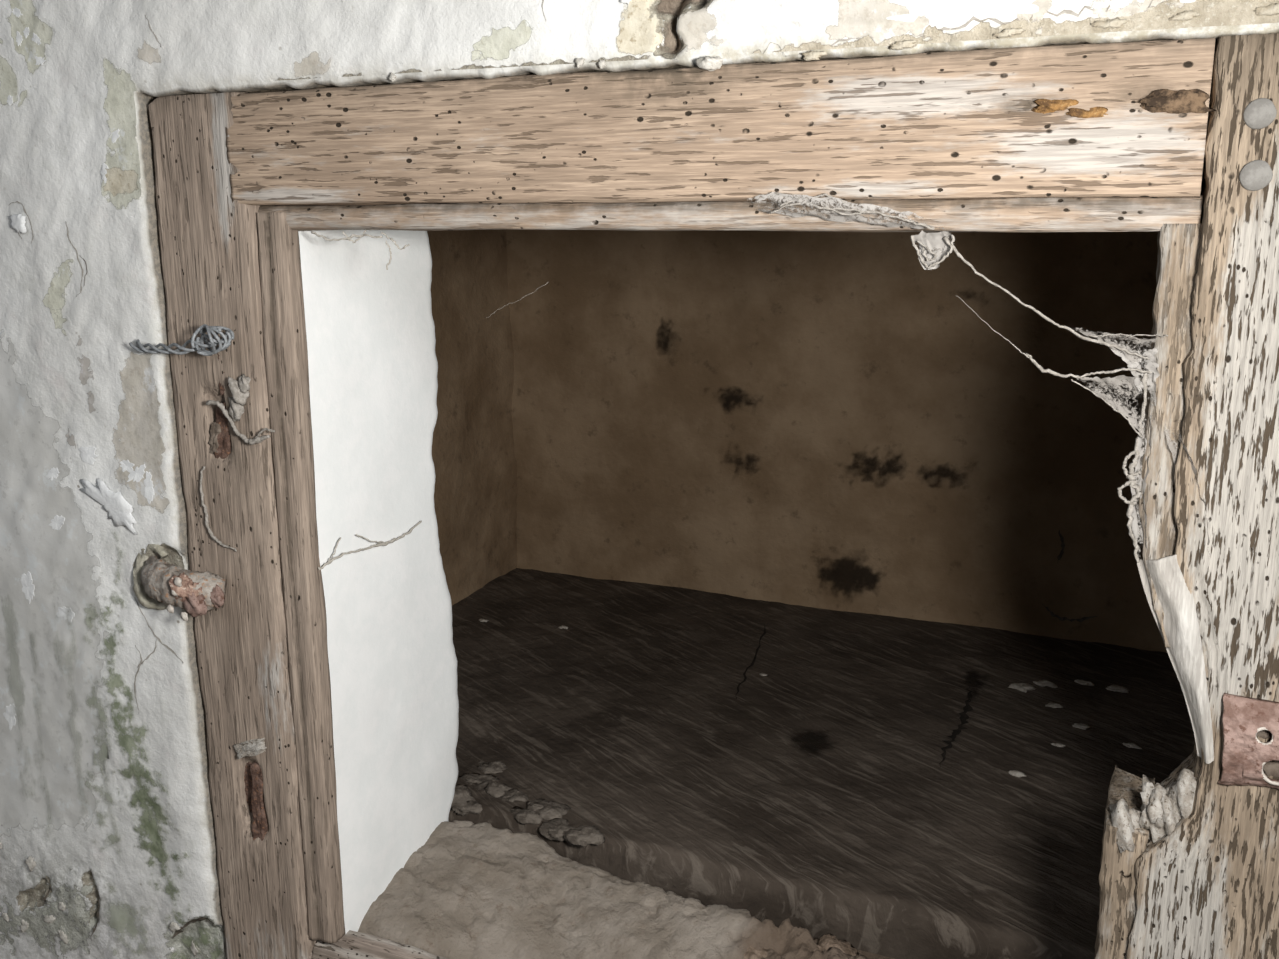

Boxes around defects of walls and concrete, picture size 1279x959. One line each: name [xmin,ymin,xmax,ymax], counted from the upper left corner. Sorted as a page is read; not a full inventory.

peeling [0,0,53,107]
spalling [754,0,1279,61]
peeling [43,259,96,413]
peeling [113,352,170,513]
peeling [0,329,109,849]
spalling [133,543,188,621]
damp [3,608,23,715]
spalling [0,856,100,959]